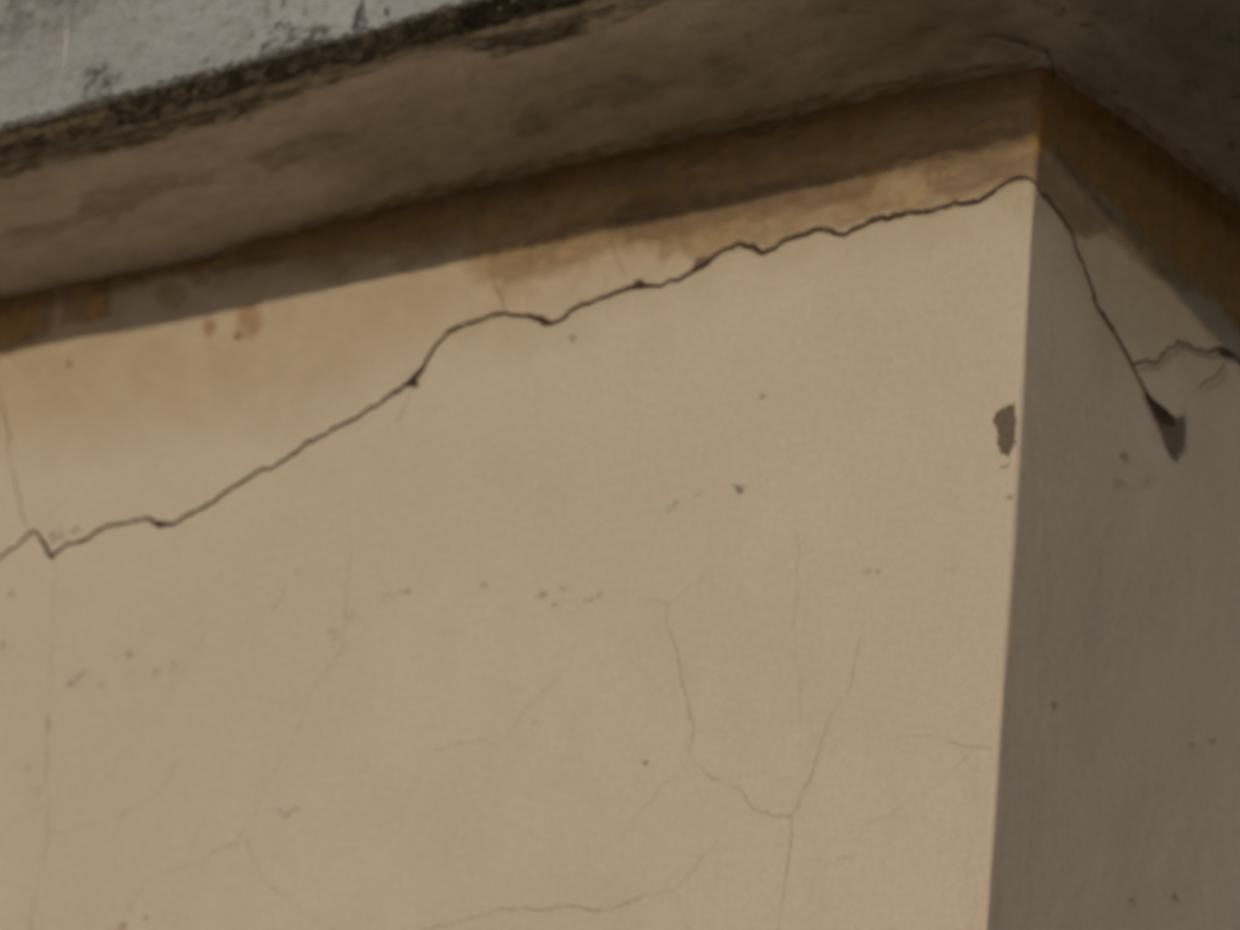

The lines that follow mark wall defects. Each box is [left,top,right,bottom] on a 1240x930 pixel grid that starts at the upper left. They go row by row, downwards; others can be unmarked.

damp [0,0,586,177]
damp [215,67,1240,325]
crack [0,175,1240,559]
peeling [992,404,1016,457]